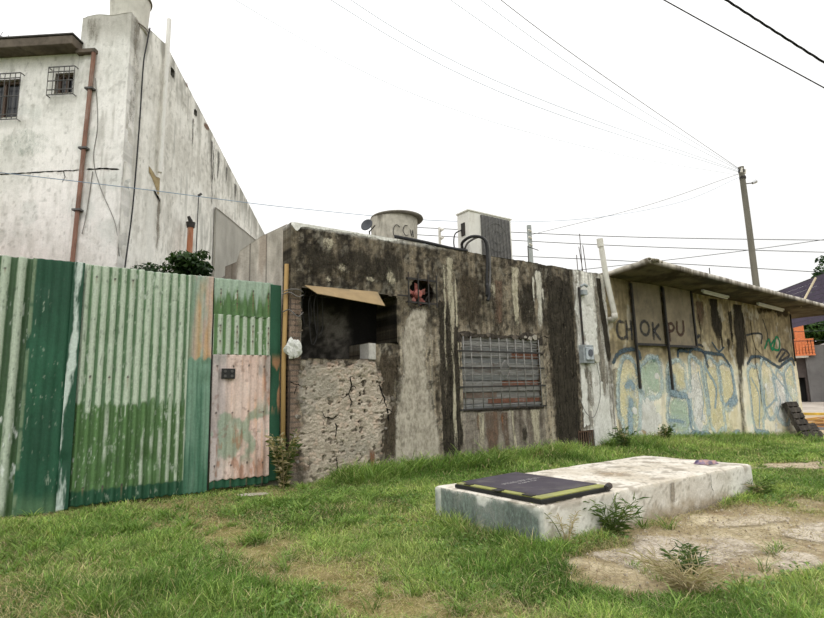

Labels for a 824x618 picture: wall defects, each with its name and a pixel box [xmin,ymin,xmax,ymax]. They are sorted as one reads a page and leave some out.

water stain [307,238,403,283]
crack [322,377,356,437]
spalling [291,359,395,484]
crack [379,384,392,421]
water stain [376,352,397,458]
water stain [438,257,479,454]
water stain [511,409,540,448]
water stain [511,267,581,442]
water stain [594,278,625,433]
water stain [709,298,748,433]